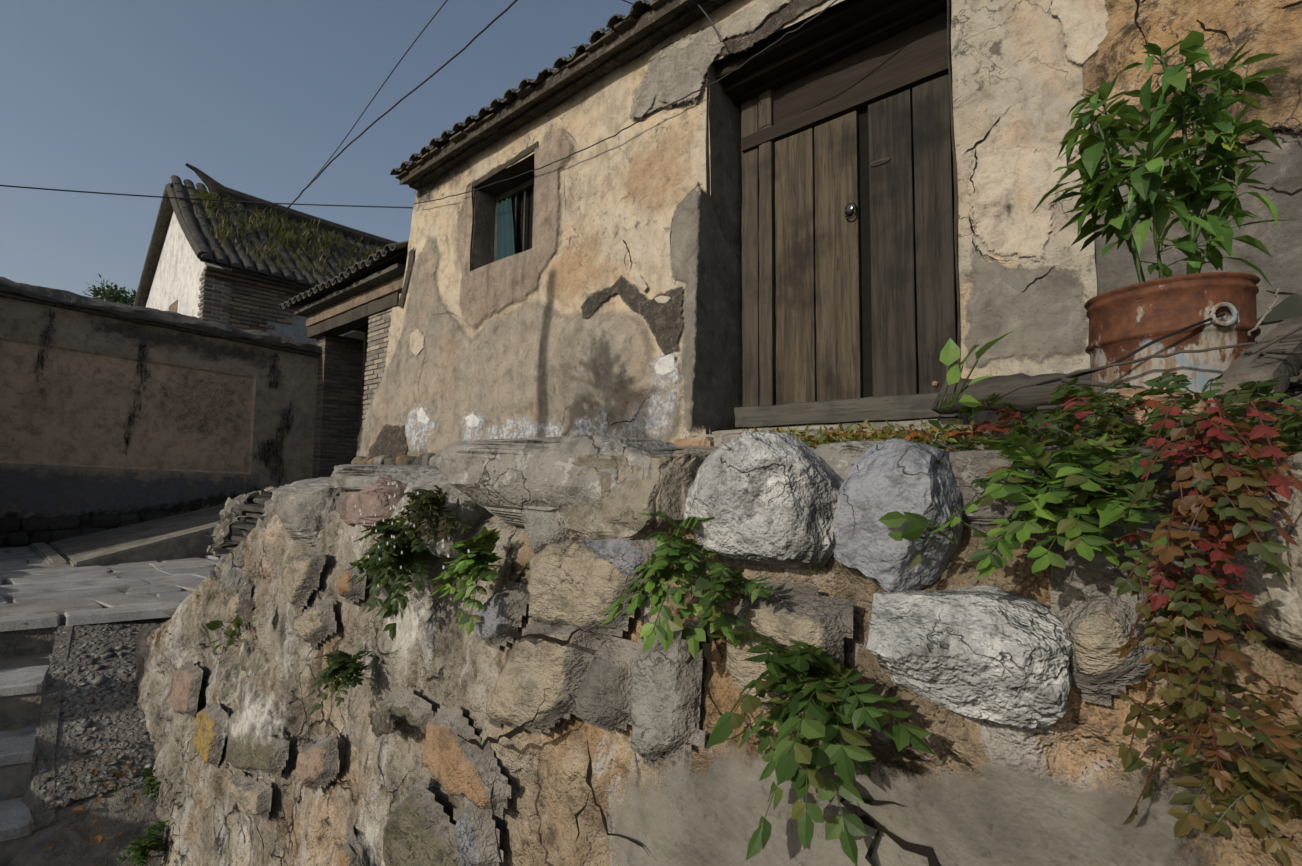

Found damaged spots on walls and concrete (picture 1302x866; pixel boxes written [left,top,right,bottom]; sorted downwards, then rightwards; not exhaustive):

crack [1134,0,1177,106]
crack [1197,19,1231,44]
crack [1249,127,1302,138]
flaking render [360,182,743,457]
leakage [0,403,294,517]
leakage [94,323,282,455]
leakage [405,405,435,451]
leakage [463,352,679,441]
crack [499,627,594,646]
crack [457,687,554,866]
crack [575,740,649,855]